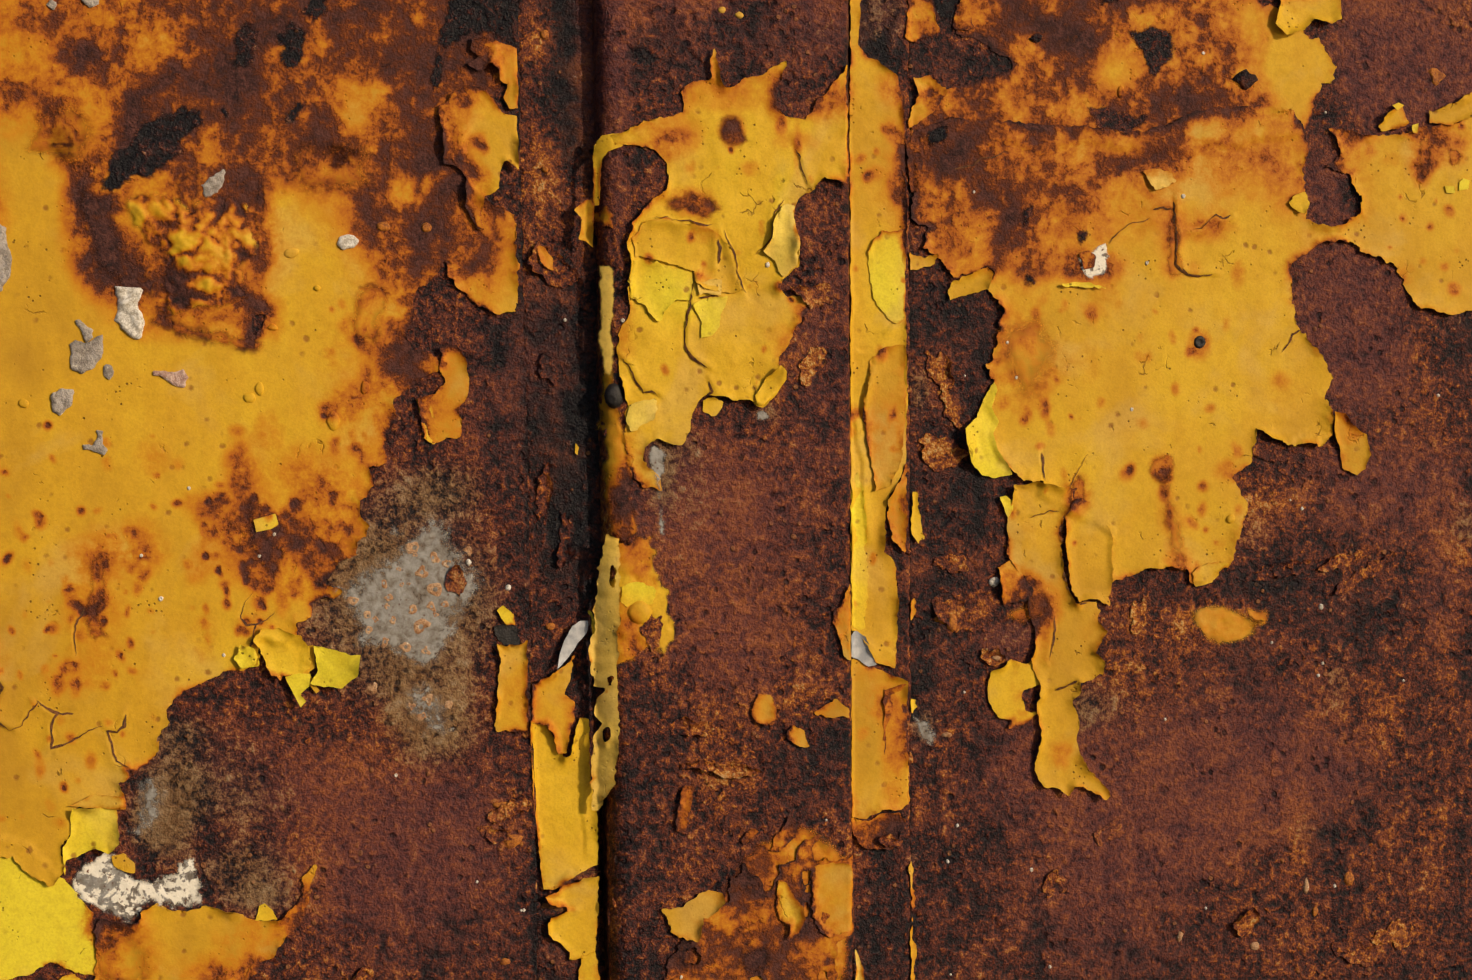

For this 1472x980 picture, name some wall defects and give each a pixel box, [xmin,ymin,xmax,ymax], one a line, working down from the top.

rust [277,0,328,69]
rust [78,105,261,352]
crack [658,149,807,397]
crack [622,358,656,394]
rust [918,350,969,472]
peeling [0,0,520,980]
peeling [494,0,1472,980]
crack [74,607,85,654]
rust [640,614,664,652]
rust [1194,607,1267,643]
crack [0,682,127,767]
rust [724,828,847,917]